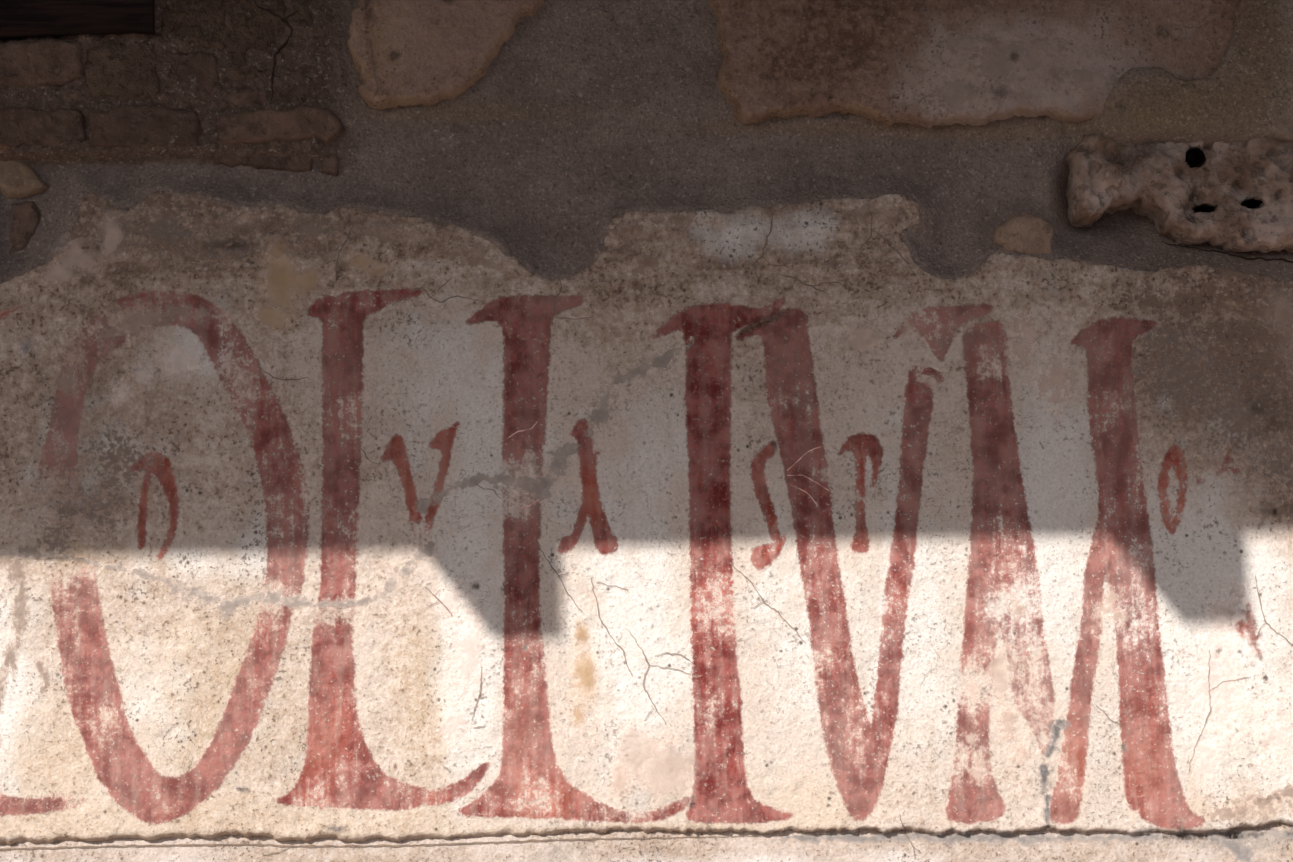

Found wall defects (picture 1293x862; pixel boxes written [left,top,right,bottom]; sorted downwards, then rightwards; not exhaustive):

crack [0,345,689,619]
crack [471,667,486,728]
crack [534,539,694,724]